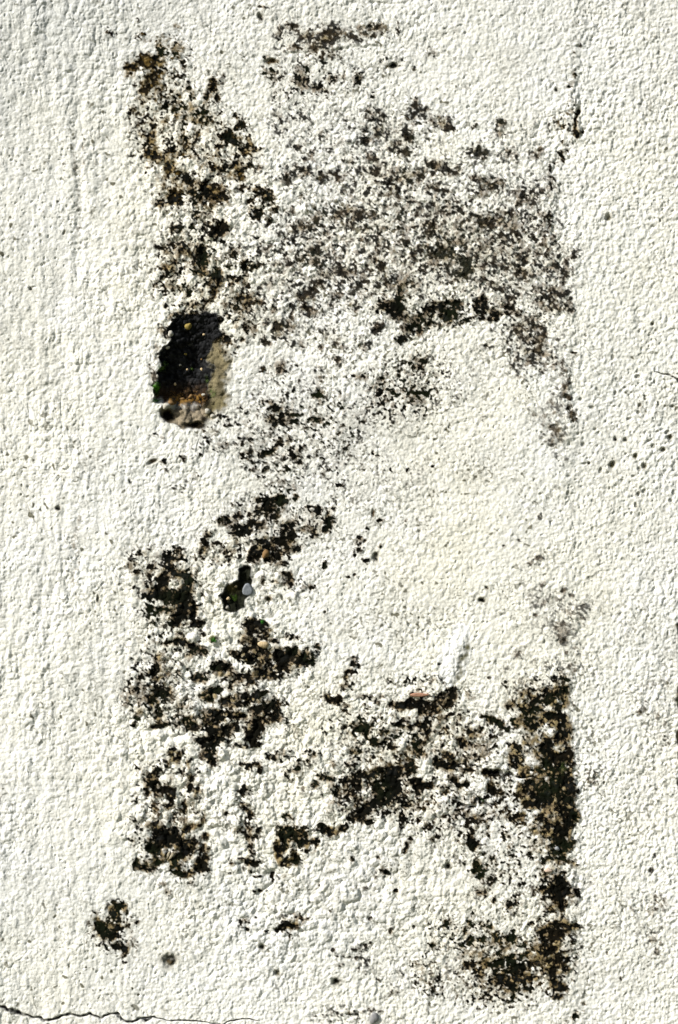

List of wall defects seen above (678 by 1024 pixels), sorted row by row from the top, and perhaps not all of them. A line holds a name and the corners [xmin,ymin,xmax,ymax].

spalling [153,310,232,429]
damp [120,18,589,1013]
damp [86,898,139,964]
crack [0,1006,258,1024]